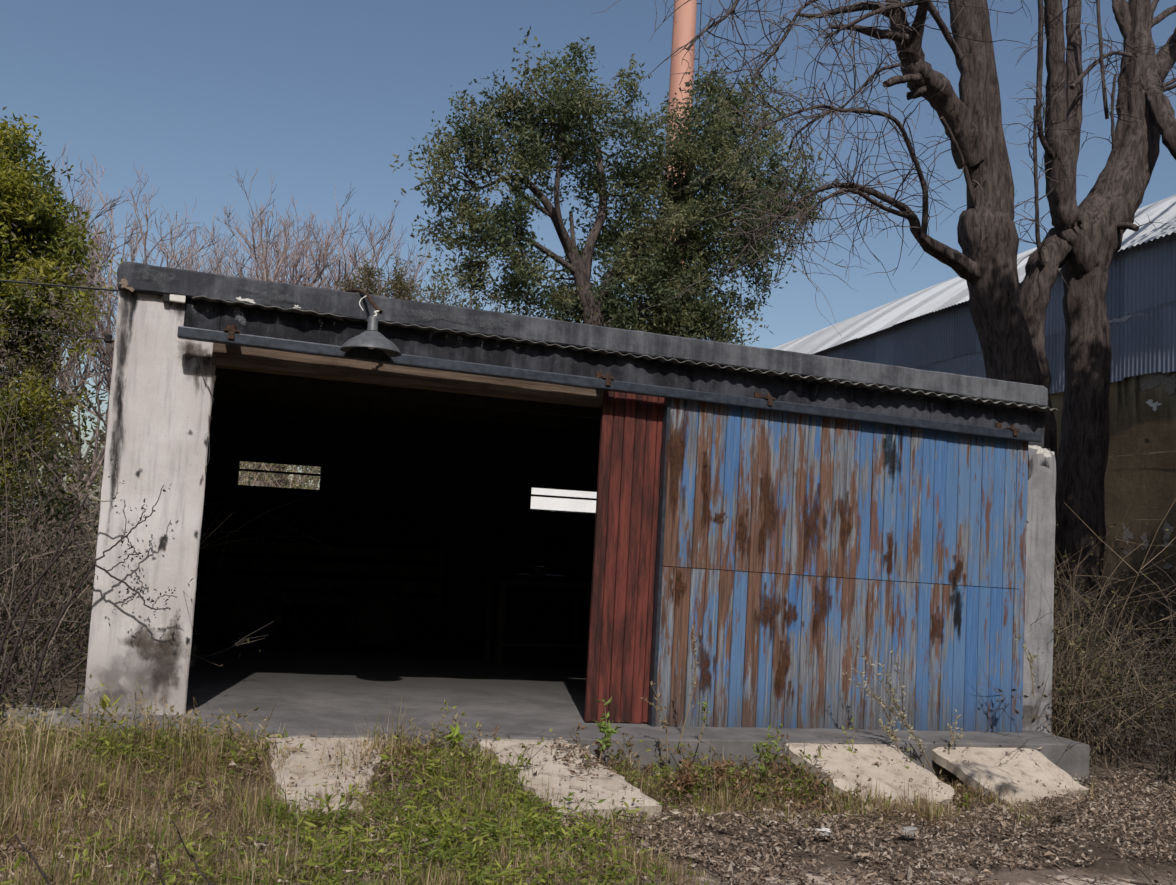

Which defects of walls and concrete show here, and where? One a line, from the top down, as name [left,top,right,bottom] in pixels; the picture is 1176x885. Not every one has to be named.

leakage [110,291,137,505]
peeling [1131,372,1176,411]
rust [665,402,687,515]
rust [883,426,903,479]
leakage [126,625,181,698]
rust [671,567,687,604]
rust [698,634,716,695]
rust [701,452,778,556]
rust [755,570,832,701]
rust [804,484,852,554]
rust [884,533,897,575]
rust [931,555,966,644]